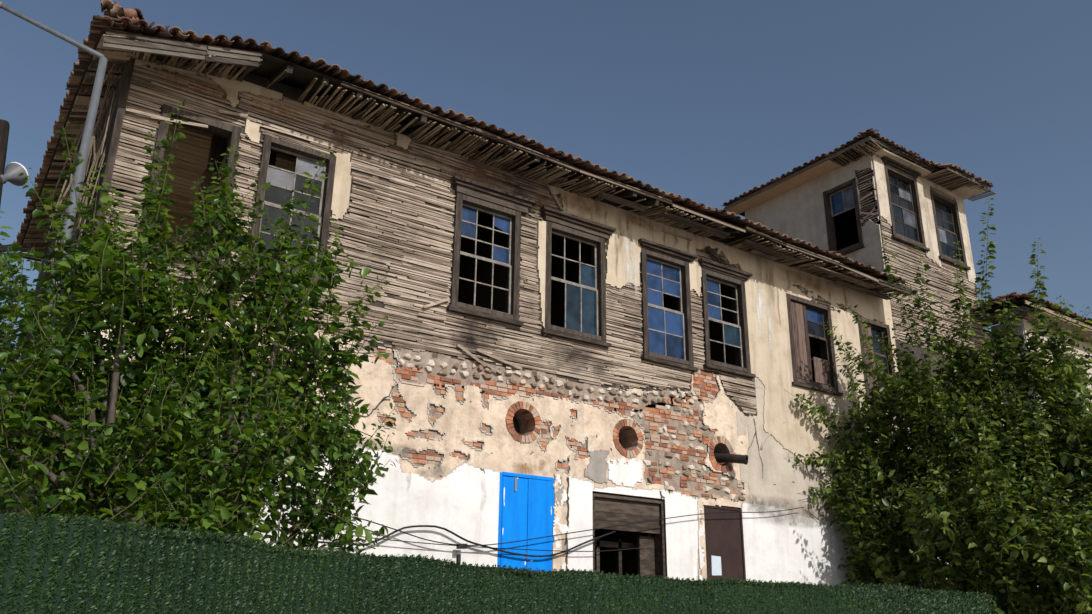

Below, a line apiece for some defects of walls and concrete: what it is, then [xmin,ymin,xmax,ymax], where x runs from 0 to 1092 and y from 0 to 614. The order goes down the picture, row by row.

flaking render [354,340,838,580]